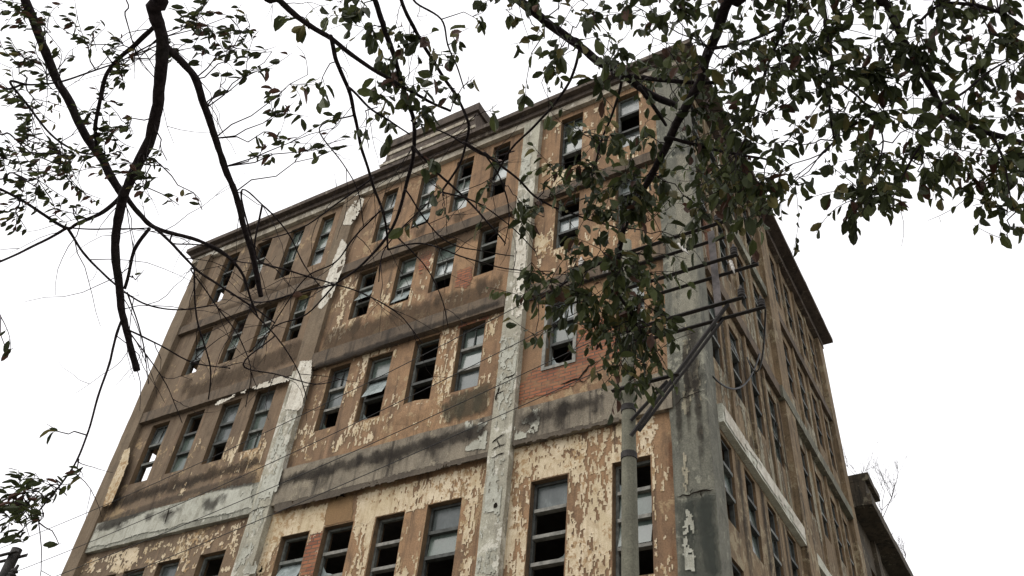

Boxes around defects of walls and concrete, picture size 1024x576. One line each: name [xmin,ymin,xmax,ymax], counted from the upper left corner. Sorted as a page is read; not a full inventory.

leakage [97,457,257,530]
peeling [81,149,622,576]
leakage [279,385,489,486]
leakage [520,399,596,425]
peeling [636,416,689,521]
peeling [649,509,696,576]
leakage [674,330,703,439]
peeling [681,324,702,415]